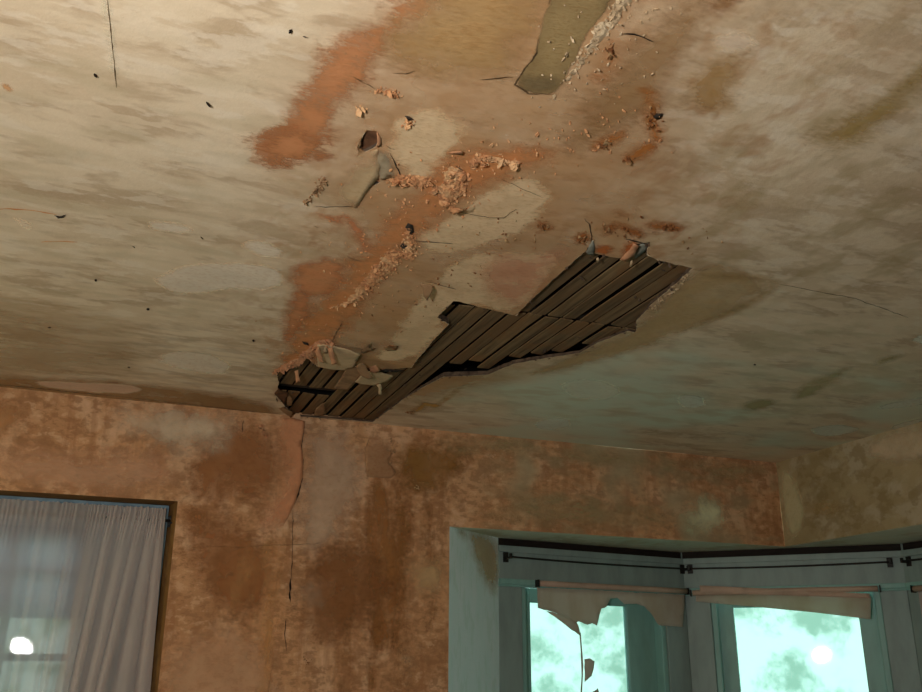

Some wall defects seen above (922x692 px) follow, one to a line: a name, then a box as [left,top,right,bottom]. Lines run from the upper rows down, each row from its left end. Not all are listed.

flaking render [563,0,633,84]
flaking render [343,130,521,215]
damp [356,0,693,315]
flaking render [645,104,664,132]
flaking render [334,223,421,311]
damp [331,245,449,370]
flaking render [272,339,337,383]
damp [411,376,482,396]
damp [194,429,276,498]
damp [190,511,272,608]
crack [209,427,328,642]
damp [308,482,409,648]